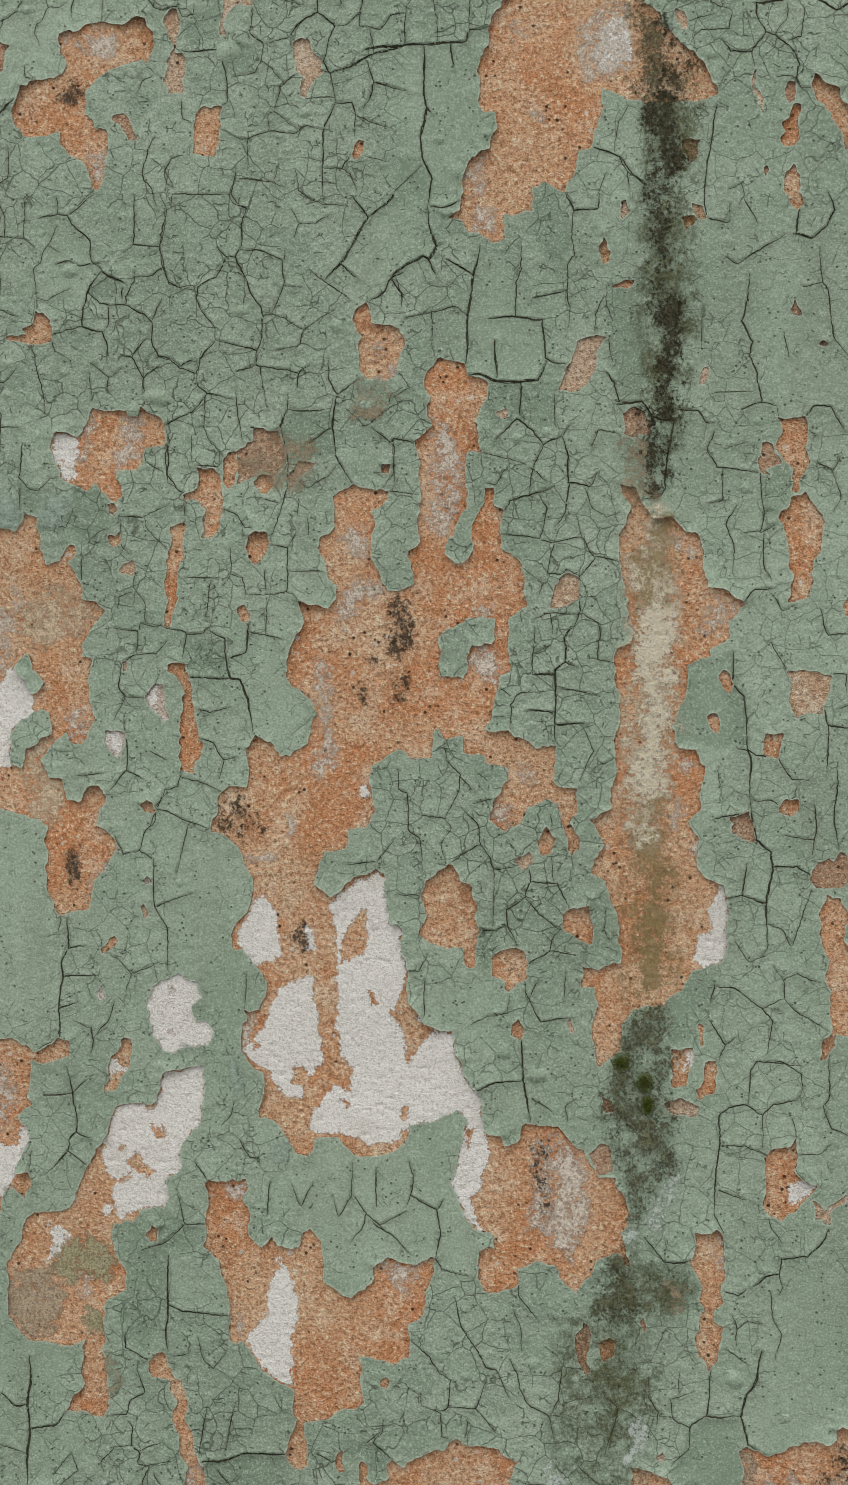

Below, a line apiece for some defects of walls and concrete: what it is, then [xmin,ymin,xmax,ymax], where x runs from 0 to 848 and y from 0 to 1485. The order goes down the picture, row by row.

peeling [11,8,186,190]
peeling [449,0,718,243]
damp [618,3,704,1007]
peeling [0,513,125,915]
peeling [210,358,745,1293]
peeling [0,973,213,1417]
crack [1,1164,334,1485]
peeling [203,1179,435,1469]
crack [221,1101,562,1440]
efflorescence [622,1416,650,1466]
damp [591,1155,689,1325]
crack [579,652,848,1484]